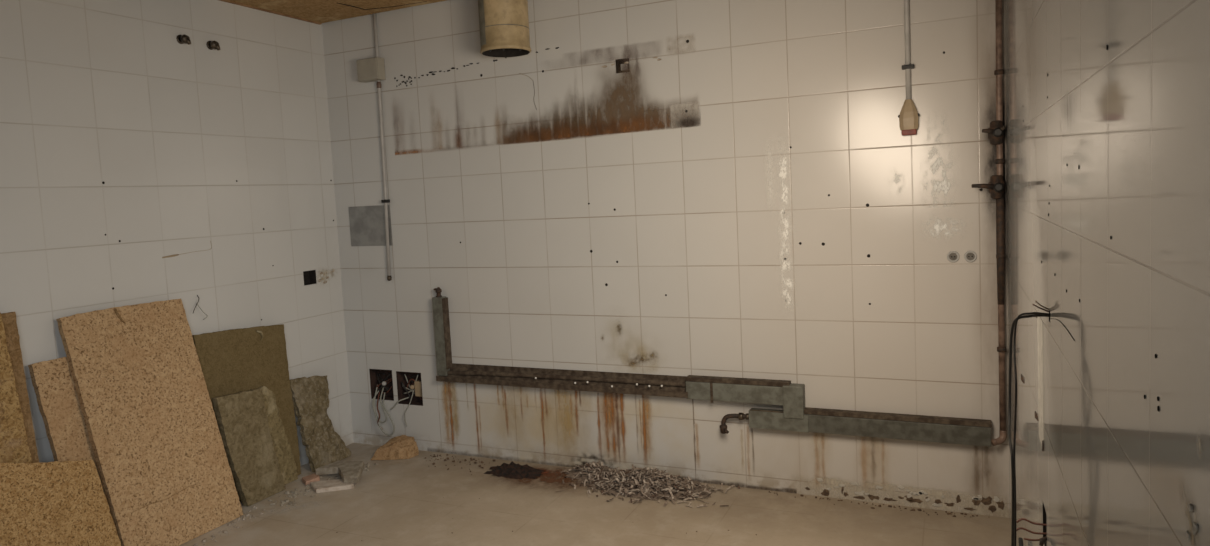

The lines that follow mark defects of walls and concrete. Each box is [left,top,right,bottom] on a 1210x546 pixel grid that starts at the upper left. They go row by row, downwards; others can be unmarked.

rust [504,121,643,144]
rust [598,393,625,451]
rust [640,395,649,456]